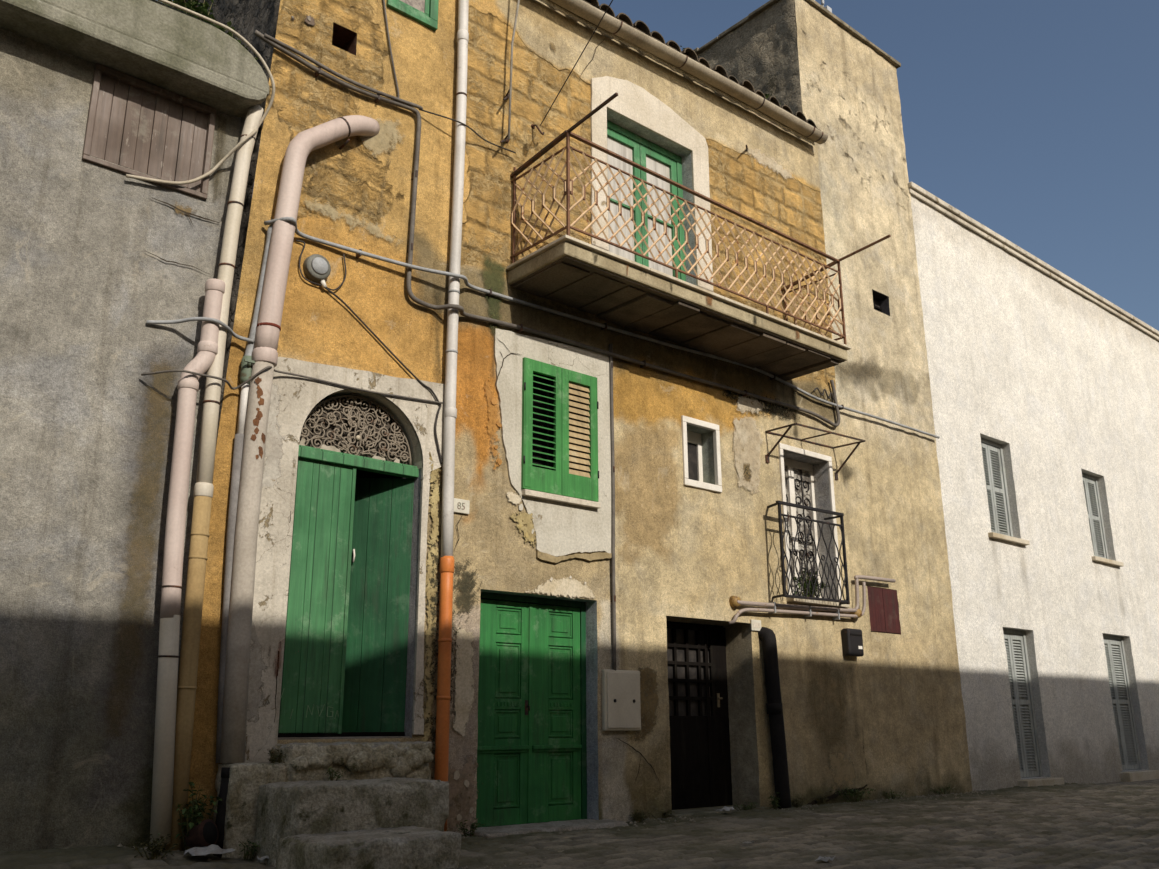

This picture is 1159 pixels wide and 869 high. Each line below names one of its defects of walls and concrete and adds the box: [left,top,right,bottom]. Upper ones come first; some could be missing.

corrosion [250,377,266,459]
flaking render [485,328,612,563]
damp [450,559,483,703]
flaking render [525,576,595,599]